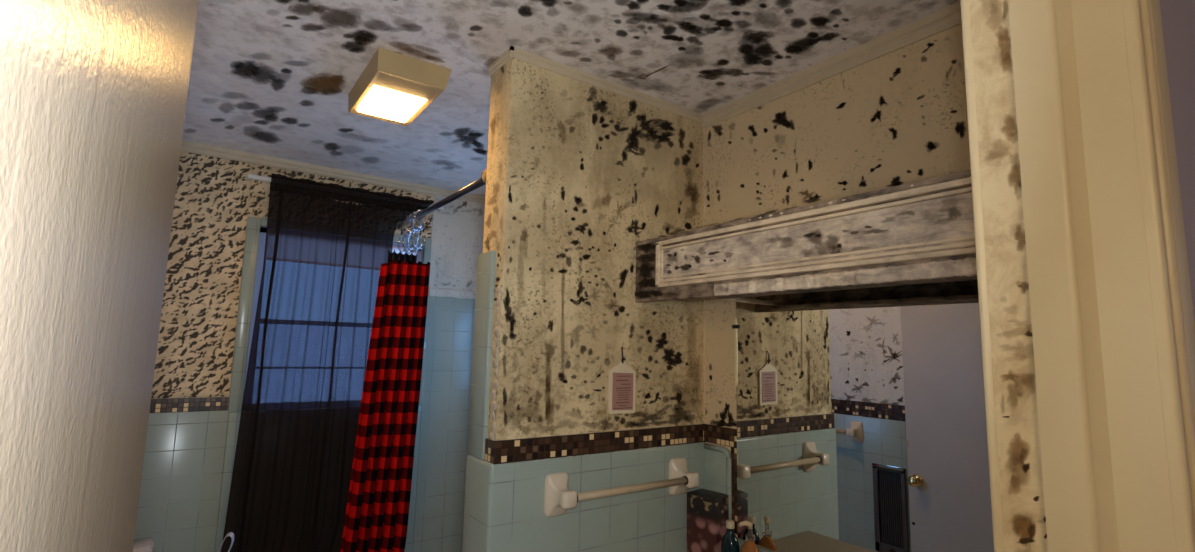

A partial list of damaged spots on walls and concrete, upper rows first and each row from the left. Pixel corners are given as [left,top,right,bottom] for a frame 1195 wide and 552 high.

leakage [276,0,376,51]
leakage [518,0,571,17]
leakage [582,0,848,85]
leakage [232,61,292,90]
leakage [240,104,296,142]
leakage [455,128,488,155]
leakage [588,88,699,168]
leakage [748,111,795,137]
leakage [548,187,616,306]
leakage [485,238,516,344]
leakage [613,187,726,427]
leakage [1015,517,1047,545]